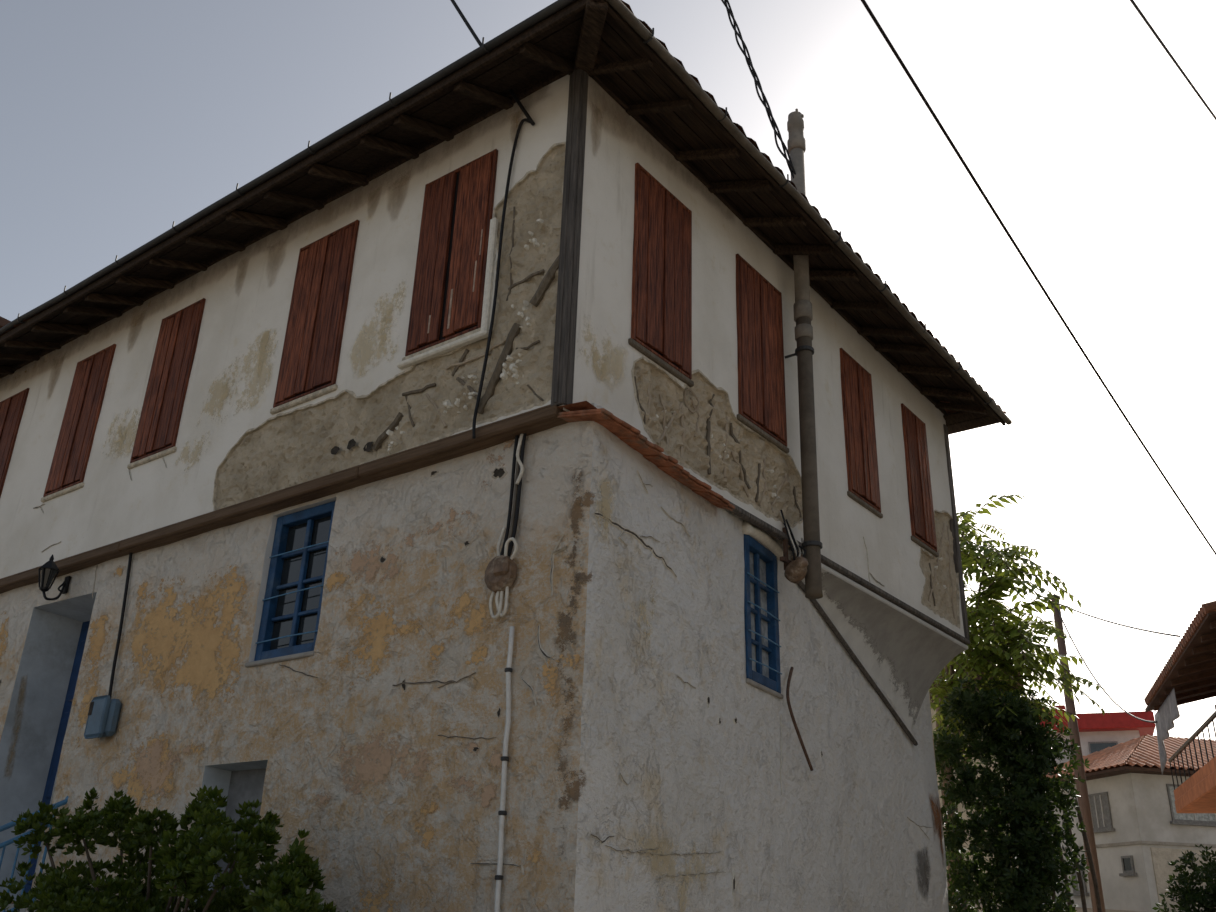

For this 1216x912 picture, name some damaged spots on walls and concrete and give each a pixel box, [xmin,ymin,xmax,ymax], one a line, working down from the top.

flaking render [212,142,566,511]
flaking render [631,356,803,528]
crack [595,470,690,578]
flaking render [919,510,960,629]
crack [392,672,476,688]
crack [591,834,726,878]